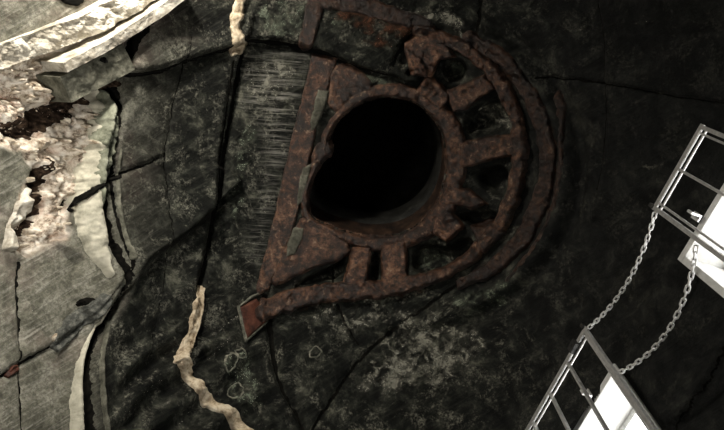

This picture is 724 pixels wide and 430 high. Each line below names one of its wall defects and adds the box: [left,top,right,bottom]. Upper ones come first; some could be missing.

spalling [0,58,100,252]
crack [83,23,413,430]